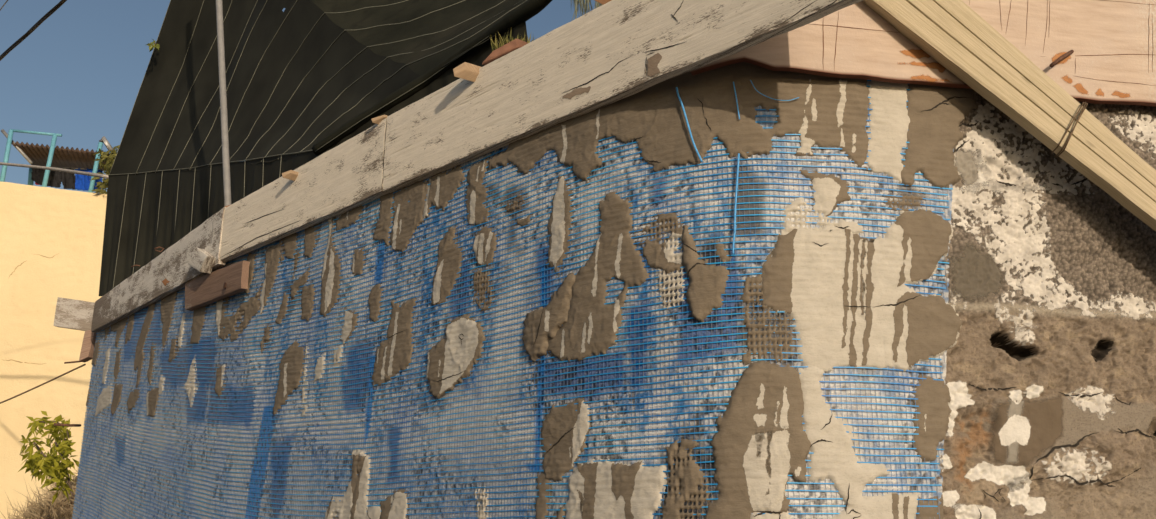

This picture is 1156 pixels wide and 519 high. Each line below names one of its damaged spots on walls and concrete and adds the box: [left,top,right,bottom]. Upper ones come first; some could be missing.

crack [999,0,1050,57]
crack [1075,0,1156,86]
peeling [951,103,1156,362]
peeling [945,380,975,437]
peeling [998,384,1043,447]
peeling [1067,385,1115,420]
peeling [940,454,953,472]
peeling [942,490,996,519]
peeling [964,461,1046,516]
peeling [1041,447,1112,485]